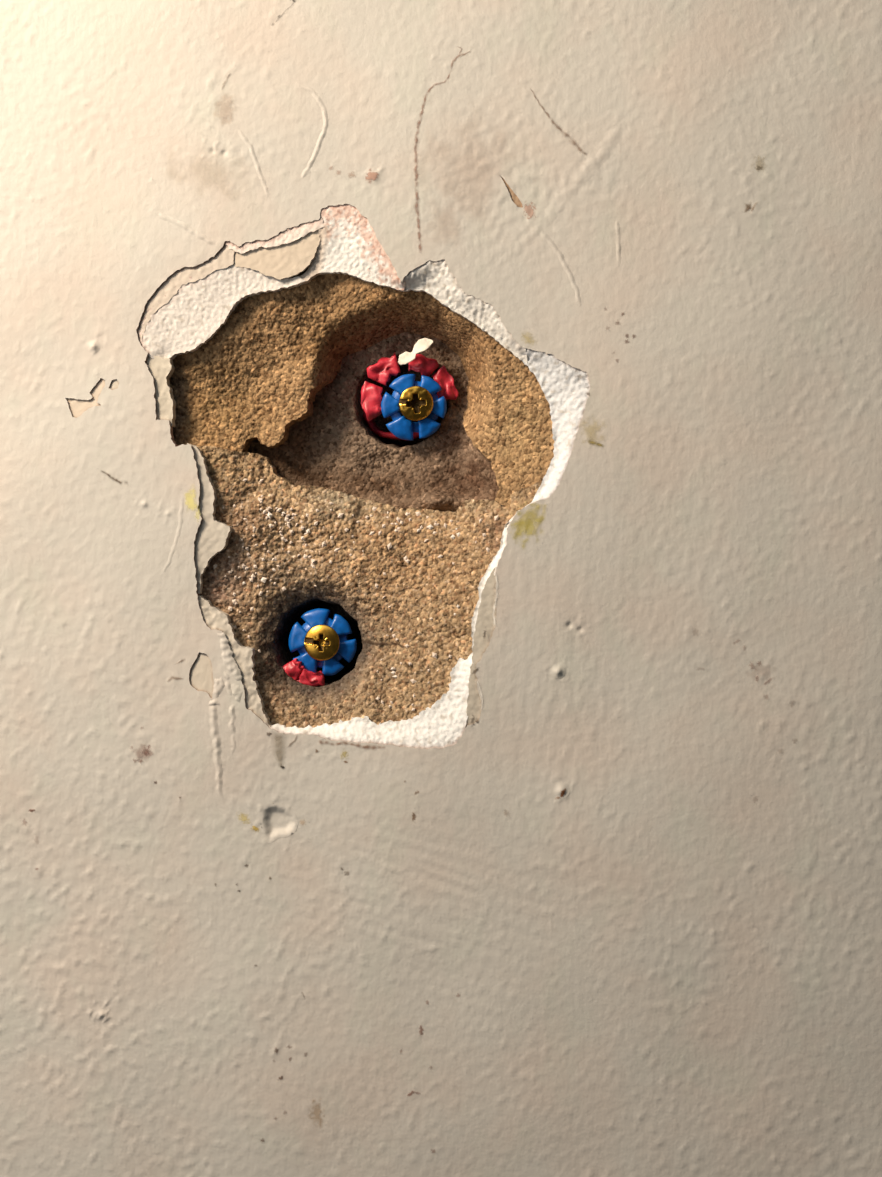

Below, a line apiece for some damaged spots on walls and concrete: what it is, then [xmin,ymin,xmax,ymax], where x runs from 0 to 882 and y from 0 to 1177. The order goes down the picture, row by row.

peeling [66,378,119,418]
flaking render [137,204,590,749]